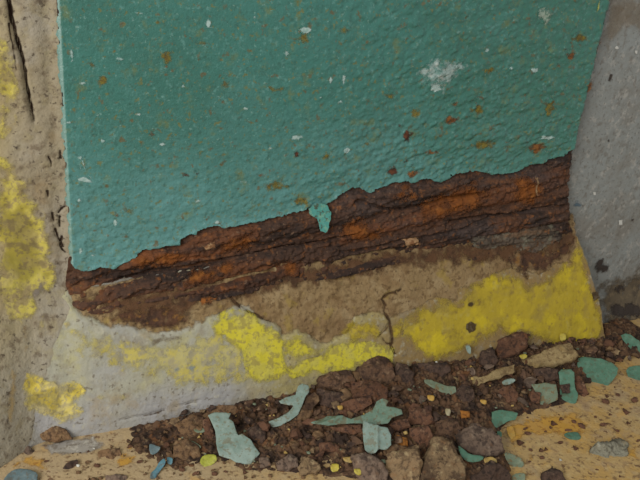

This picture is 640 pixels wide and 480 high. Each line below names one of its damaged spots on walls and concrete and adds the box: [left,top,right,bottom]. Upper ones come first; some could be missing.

crack [7,0,34,120]
peeling [0,157,56,318]
rust [65,150,575,328]
spalling [65,214,602,386]
crack [381,289,401,354]
peeling [24,373,86,422]
peeling [508,413,587,442]
peeling [531,369,578,405]